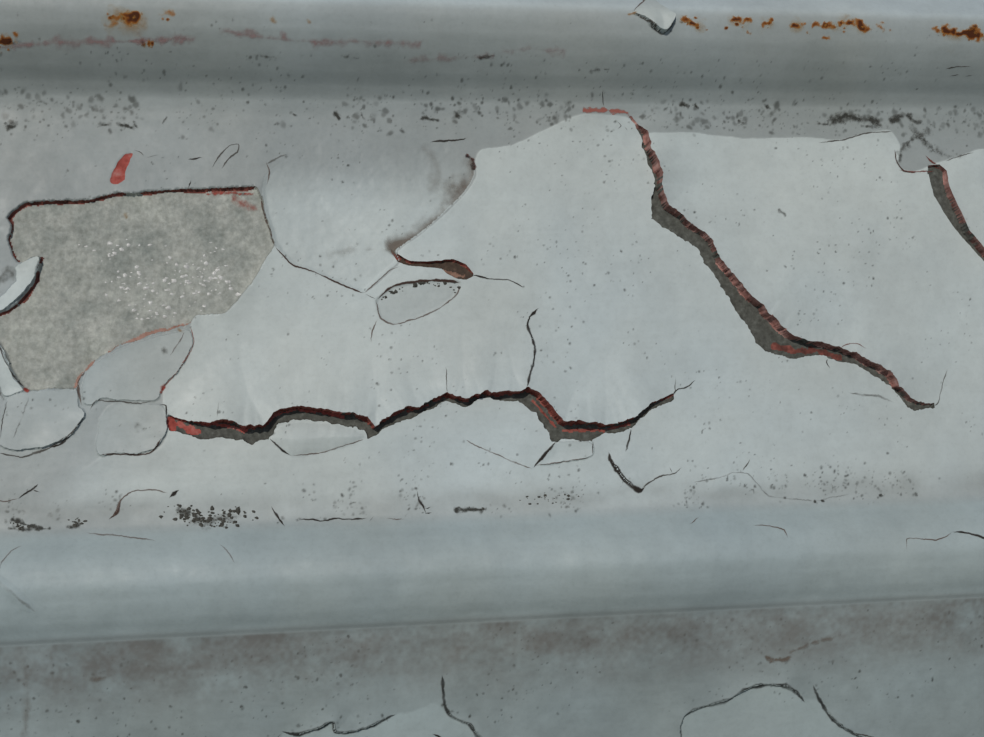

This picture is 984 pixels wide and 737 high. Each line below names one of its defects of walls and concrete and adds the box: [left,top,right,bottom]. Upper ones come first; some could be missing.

rust [107,11,141,26]
peeling [628,0,676,35]
rust [724,16,773,29]
rust [791,18,884,39]
rust [932,24,983,42]
crack [819,131,984,261]
crack [602,92,946,411]
crack [392,253,522,287]
peeling [0,138,476,458]
crack [166,309,695,493]
peeling [278,715,394,737]
peeling [814,688,872,737]